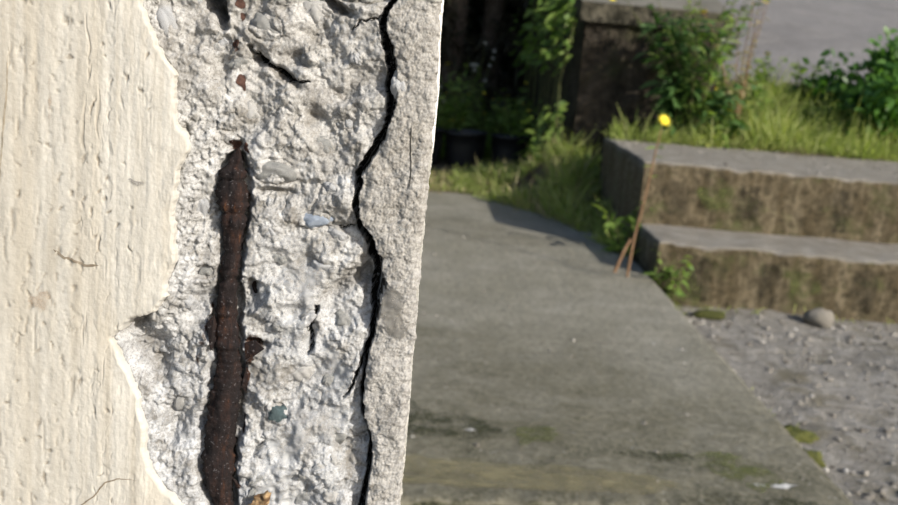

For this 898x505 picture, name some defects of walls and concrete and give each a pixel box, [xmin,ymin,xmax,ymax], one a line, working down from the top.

corrosion [235,0,246,21]
corrosion [236,74,246,91]
corrosion [229,140,249,153]
crack [339,0,412,412]
spalling [115,0,443,505]
corrosion [245,334,263,369]
crack [359,438,373,505]
crack [81,478,135,505]